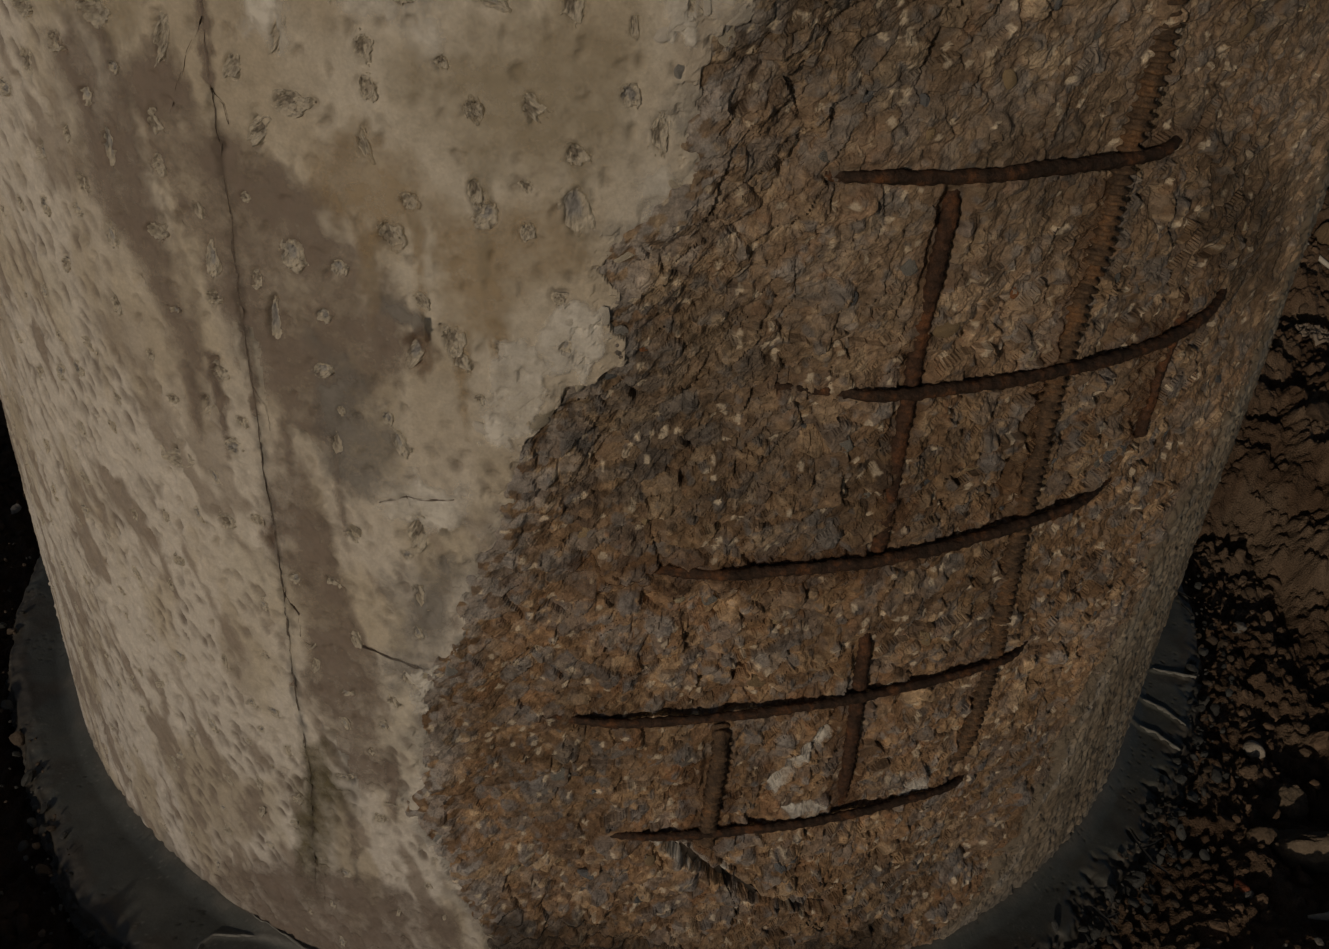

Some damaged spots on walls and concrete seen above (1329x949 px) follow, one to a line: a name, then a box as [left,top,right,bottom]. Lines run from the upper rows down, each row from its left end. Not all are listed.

spalling [0,699,73,922]
crack [172,0,326,893]
spalling [387,0,1329,949]